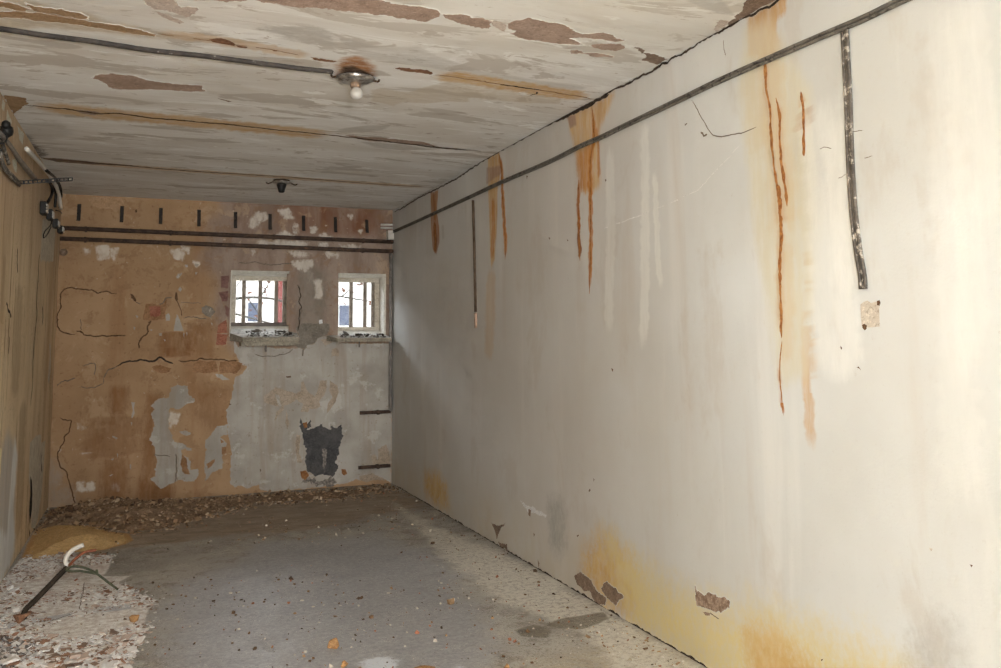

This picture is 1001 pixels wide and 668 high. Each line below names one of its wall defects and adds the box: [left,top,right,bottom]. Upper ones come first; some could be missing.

peeling [143,0,669,65]
crack [57,418,76,503]
peeling [81,243,121,262]
crack [17,249,237,405]
peeling [149,207,392,492]
corrosion [483,151,508,364]
corrosion [564,89,619,294]
corrosion [763,64,788,415]
corrosion [800,389,819,458]
peeling [574,571,624,606]
peeling [695,585,731,619]
damp [568,502,962,668]